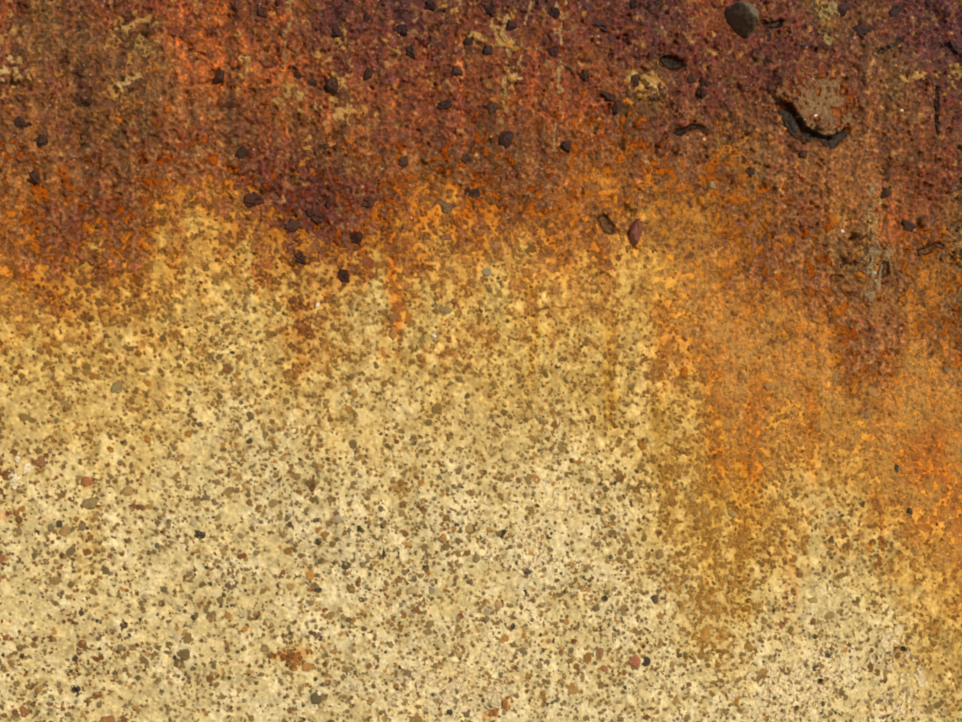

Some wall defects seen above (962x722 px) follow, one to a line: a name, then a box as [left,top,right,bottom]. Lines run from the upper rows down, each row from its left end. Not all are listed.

rust [211,263,255,290]
rust [260,272,289,291]
rust [286,281,314,311]
rust [306,272,332,287]
rust [67,308,92,329]
rust [283,288,350,384]
rust [439,318,497,374]
rust [646,339,689,394]
rust [749,495,810,555]
rust [844,534,888,552]
rust [898,554,922,588]